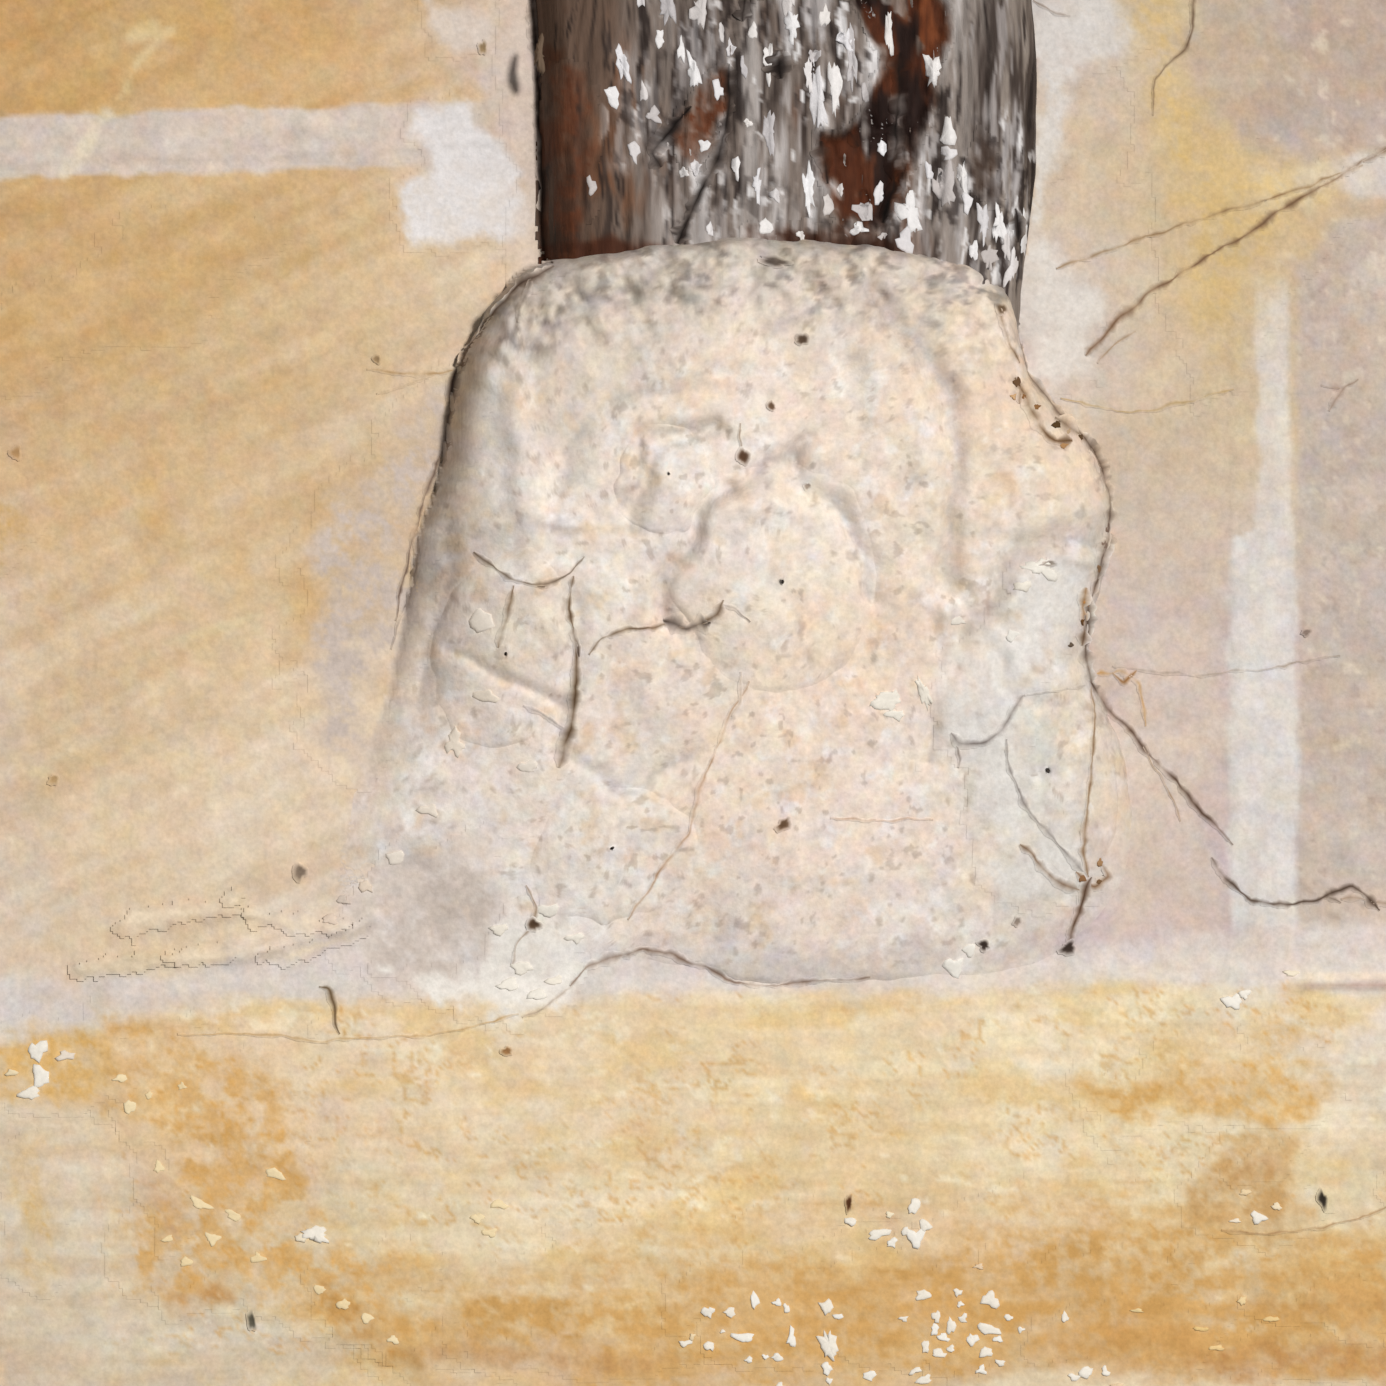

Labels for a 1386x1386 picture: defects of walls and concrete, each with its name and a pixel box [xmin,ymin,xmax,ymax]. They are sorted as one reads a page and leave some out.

peeling [604,43,662,123]
peeling [637,0,773,100]
peeling [781,0,869,128]
peeling [884,12,894,56]
crack [1151,0,1198,115]
peeling [796,161,923,254]
crack [1008,208,1026,242]
peeling [922,0,1152,401]
crack [1056,146,1386,364]
crack [473,551,751,768]
crack [950,308,1386,943]
crack [178,672,871,1044]